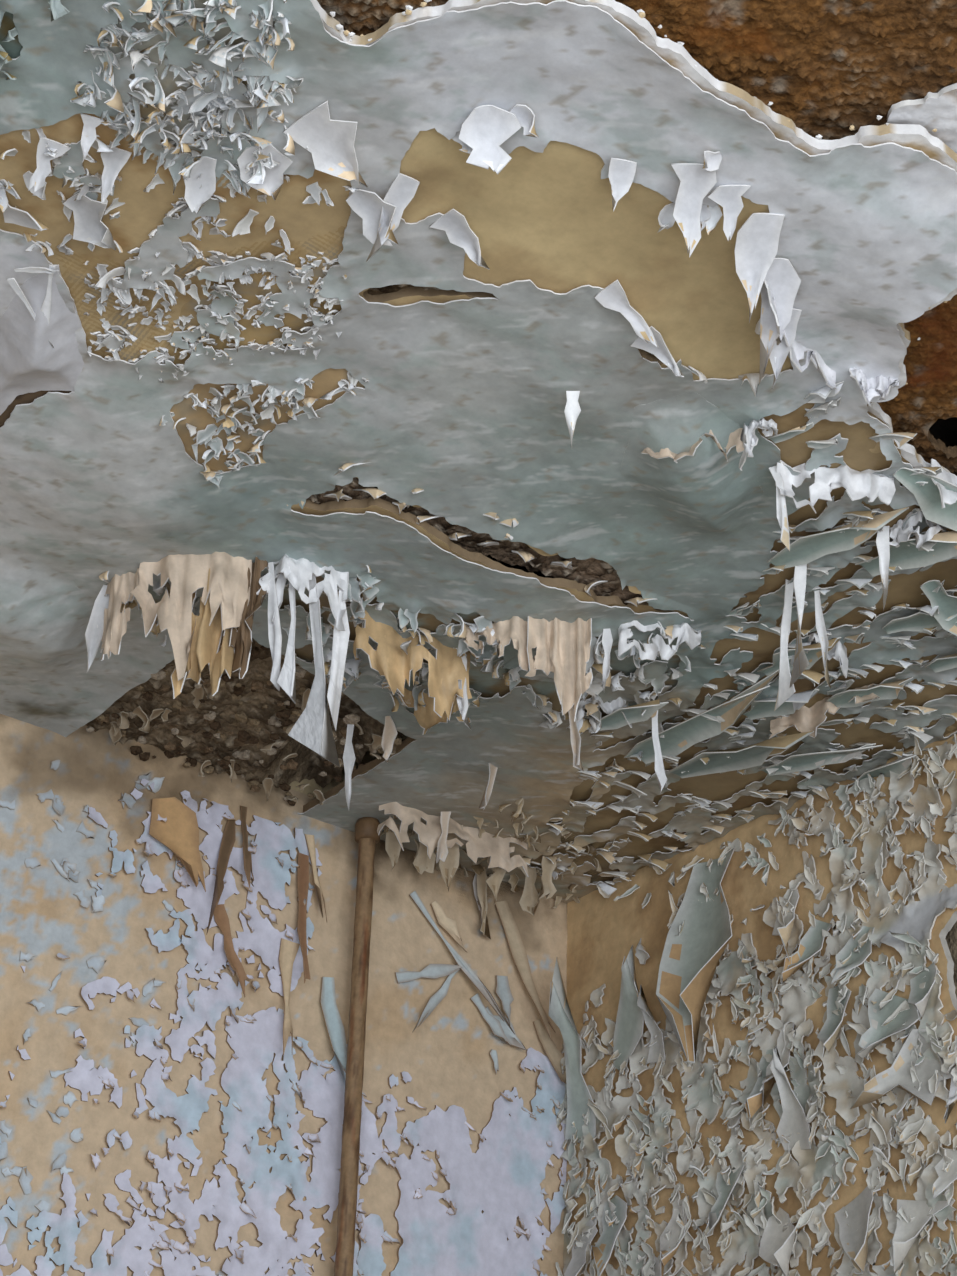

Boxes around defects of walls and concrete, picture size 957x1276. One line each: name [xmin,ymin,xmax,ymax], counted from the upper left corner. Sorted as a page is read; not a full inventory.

crack [367,284,439,295]
peeling [0,0,957,916]
crack [307,463,658,607]
peeling [0,772,347,1276]
peeling [353,856,567,1276]
peeling [549,734,957,1276]